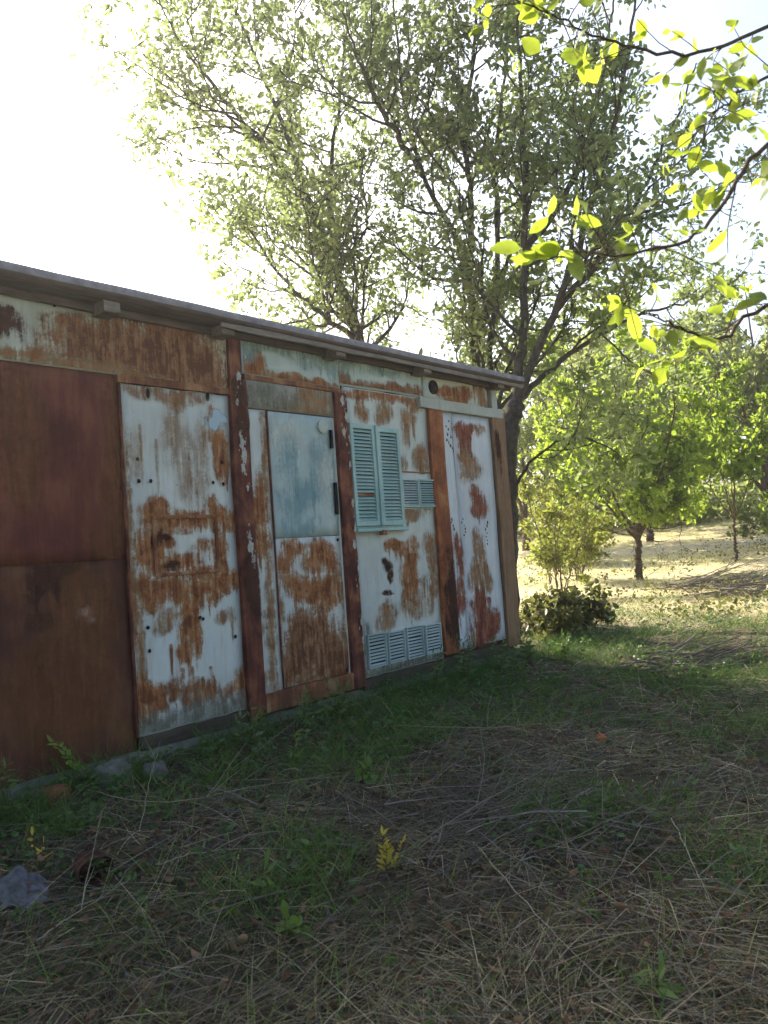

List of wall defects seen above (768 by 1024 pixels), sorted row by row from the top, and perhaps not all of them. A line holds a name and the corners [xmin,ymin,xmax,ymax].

rust [436,385,489,408]
rust [0,312,429,734]
rust [376,421,503,650]